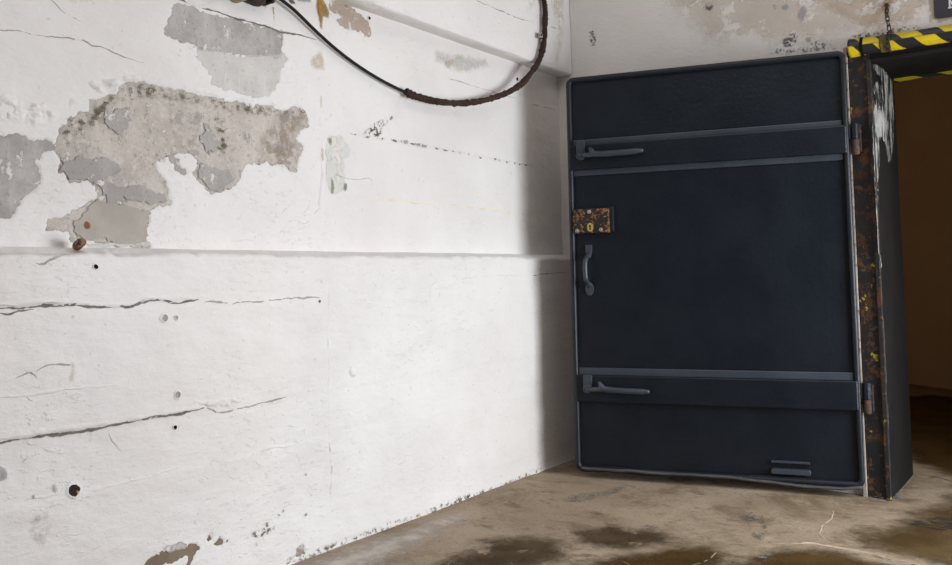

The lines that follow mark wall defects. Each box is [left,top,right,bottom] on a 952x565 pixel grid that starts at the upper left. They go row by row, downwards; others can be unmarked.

peeling [0,3,309,248]
crack [0,294,321,315]
crack [0,363,120,401]
crack [0,397,285,444]
damp [909,395,952,474]
peeling [145,535,228,565]
damp [442,537,561,565]
damp [578,524,722,565]
damp [737,550,889,565]
damp [855,498,952,565]